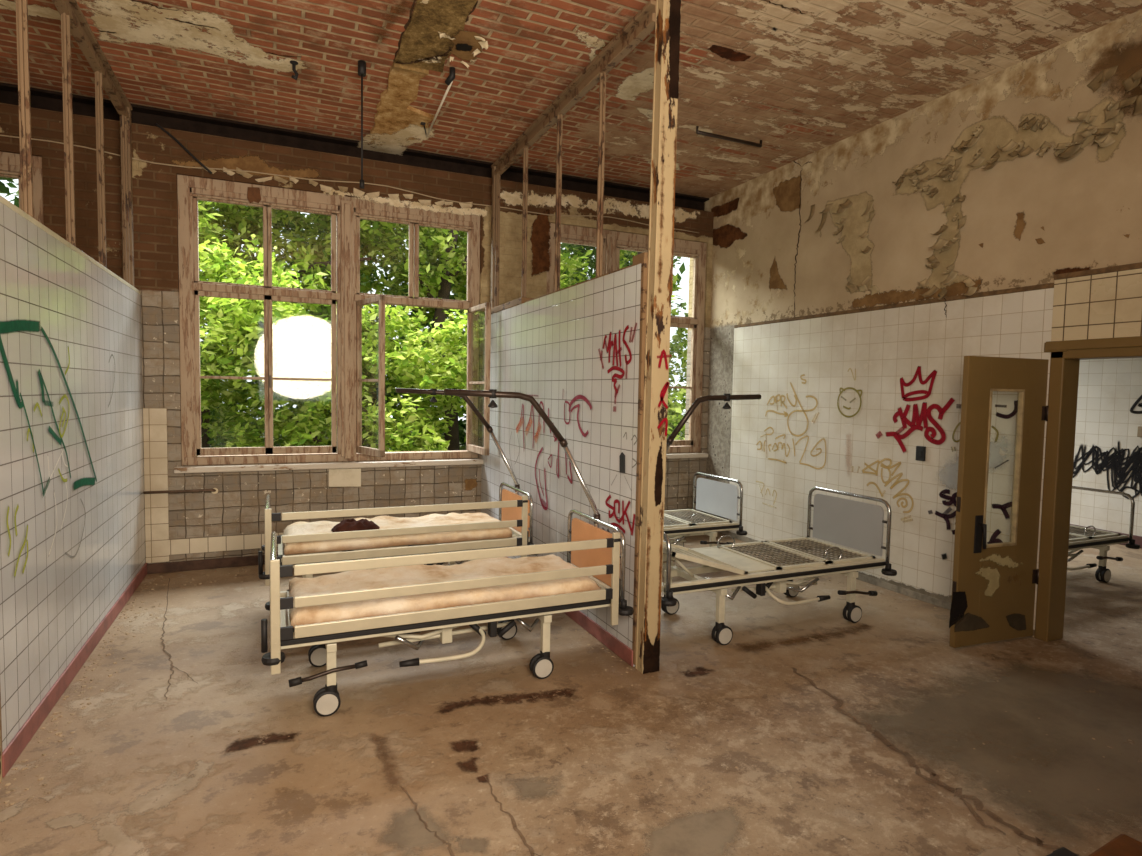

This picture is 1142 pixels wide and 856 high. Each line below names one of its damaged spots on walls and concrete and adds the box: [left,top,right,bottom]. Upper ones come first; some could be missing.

peeling [79,0,307,72]
spalling [418,30,488,68]
peeling [669,0,681,99]
peeling [357,124,435,155]
peeling [500,67,747,295]
peeling [773,97,1126,308]
spalling [769,256,787,290]
peeling [654,447,663,506]
crack [160,579,197,699]
crack [792,668,1080,855]
crack [401,787,455,856]
crack [484,776,540,856]